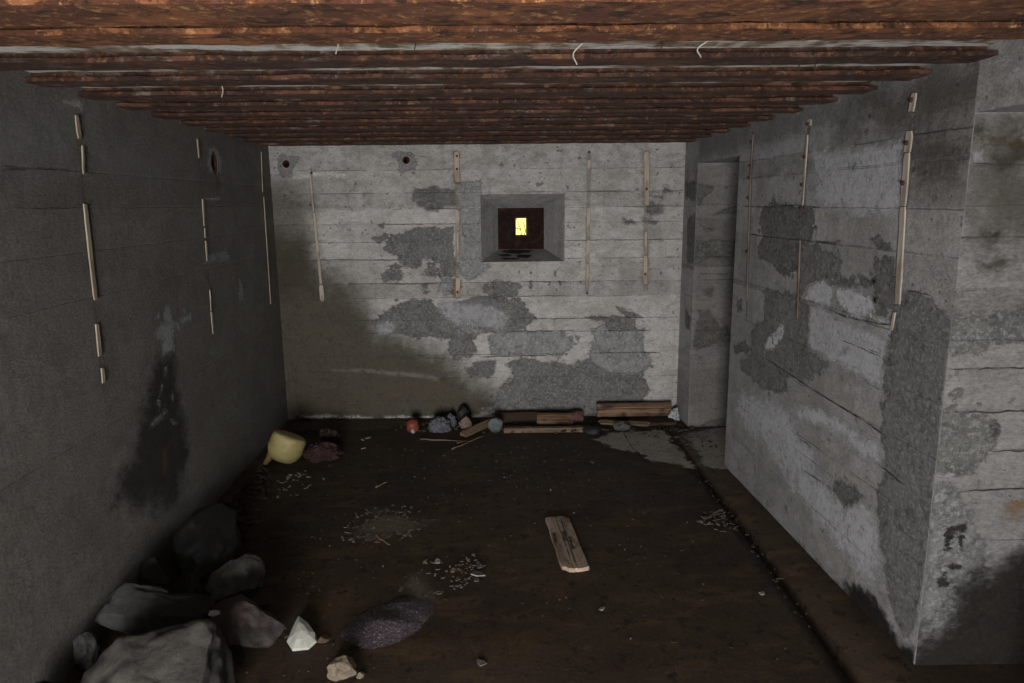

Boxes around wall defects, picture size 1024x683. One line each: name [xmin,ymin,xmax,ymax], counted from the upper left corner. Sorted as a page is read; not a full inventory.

water stain [116,305,191,514]
peeling [371,179,653,417]
peeling [734,198,1024,638]
water stain [937,523,967,589]